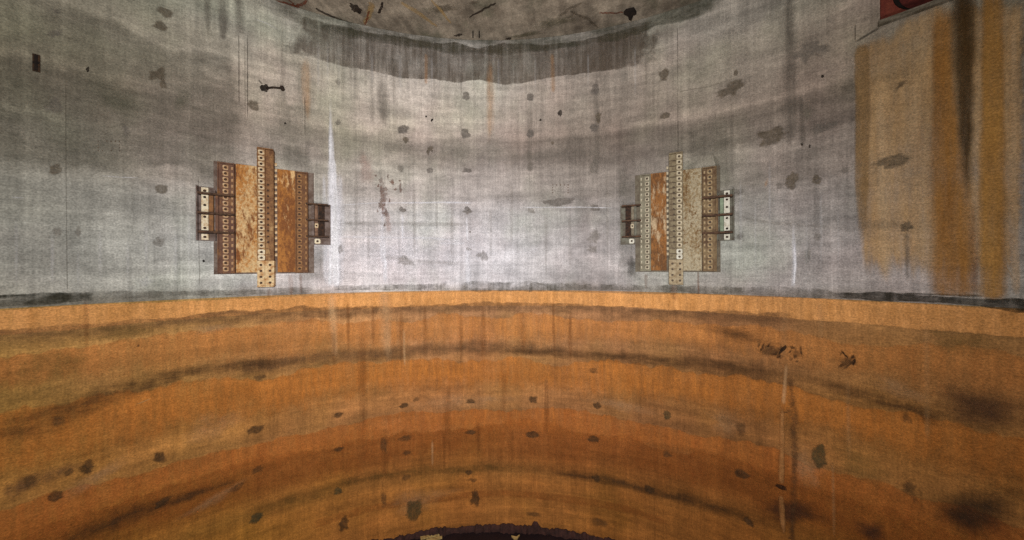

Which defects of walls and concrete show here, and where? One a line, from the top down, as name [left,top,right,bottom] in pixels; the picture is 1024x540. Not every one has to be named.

damp [298,19,654,84]
damp [329,129,340,285]
rust [0,0,1024,337]
spalling [758,342,802,362]